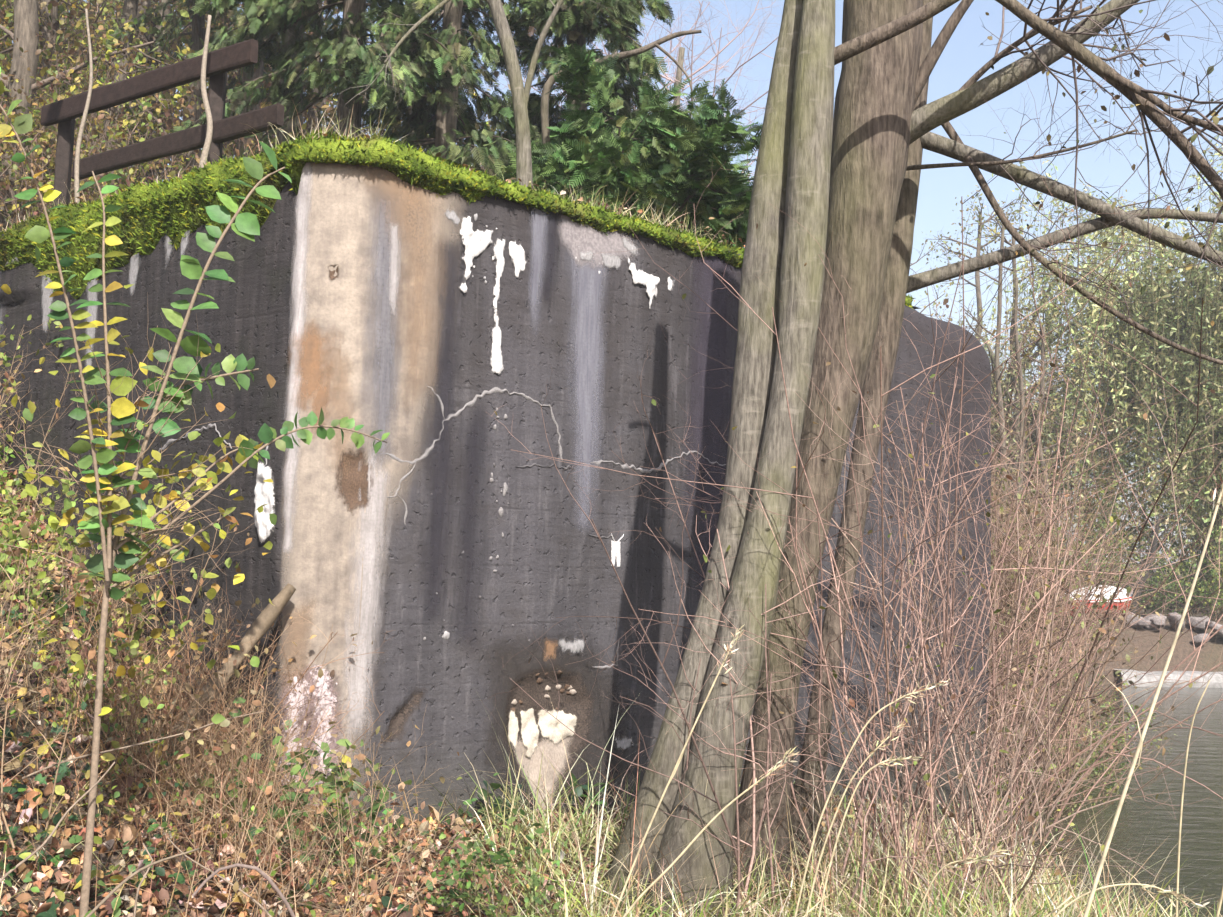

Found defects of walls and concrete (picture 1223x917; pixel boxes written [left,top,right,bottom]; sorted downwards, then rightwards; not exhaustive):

water stain [254,162,673,822]
crack [382,383,726,525]
spalling [504,639,620,814]